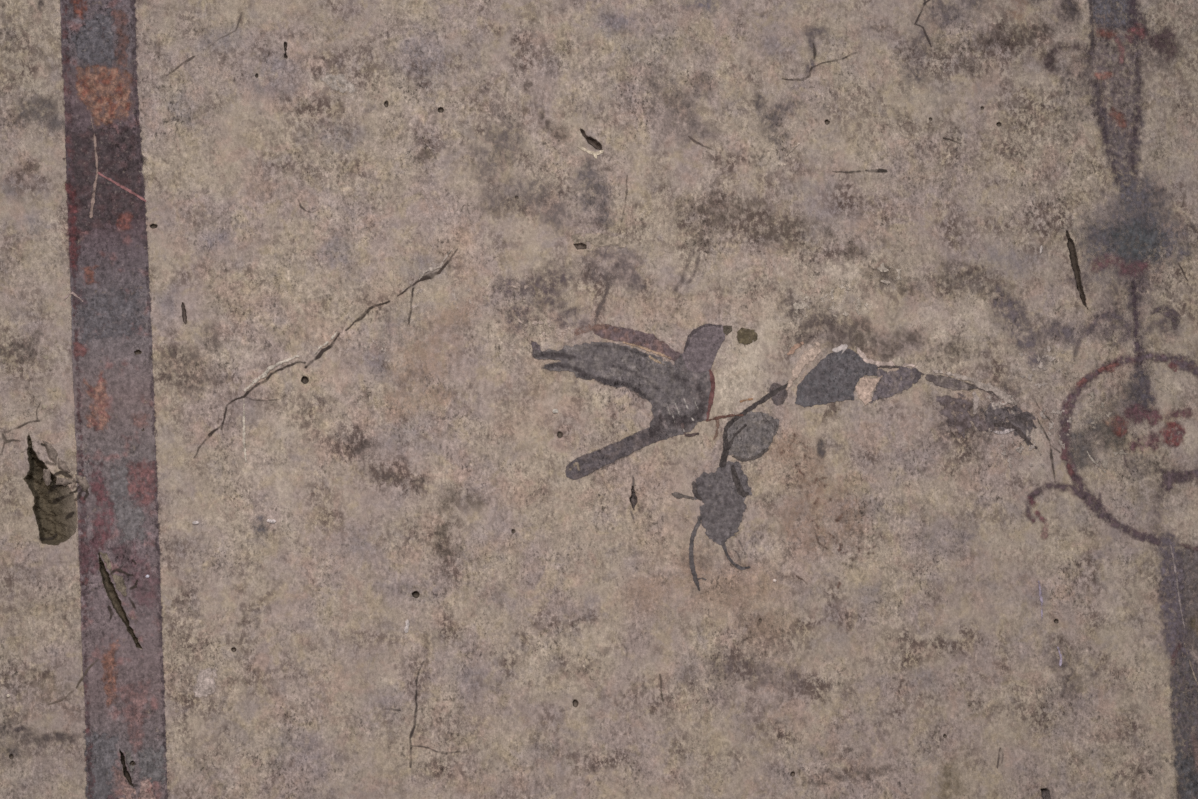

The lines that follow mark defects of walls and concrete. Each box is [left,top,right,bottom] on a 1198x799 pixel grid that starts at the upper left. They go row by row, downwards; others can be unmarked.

crack [197,248,458,452]
peeling [786,342,915,405]
spalling [23,433,149,667]